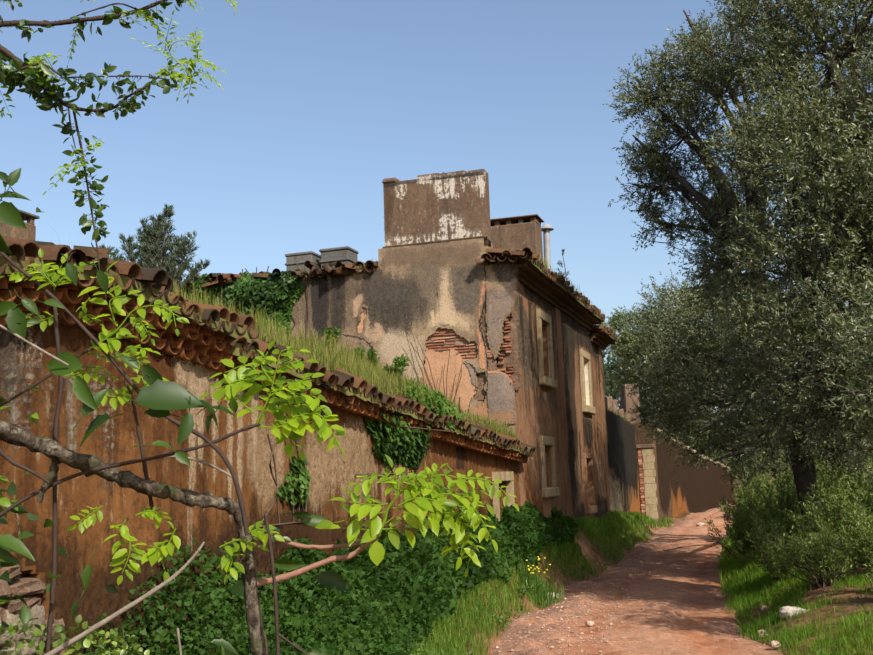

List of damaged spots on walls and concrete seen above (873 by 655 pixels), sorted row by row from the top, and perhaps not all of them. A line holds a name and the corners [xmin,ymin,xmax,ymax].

peeling [384,215,482,246]
peeling [395,169,486,200]
water stain [291,245,638,522]
flaking render [423,303,521,415]
water stain [15,447,248,655]